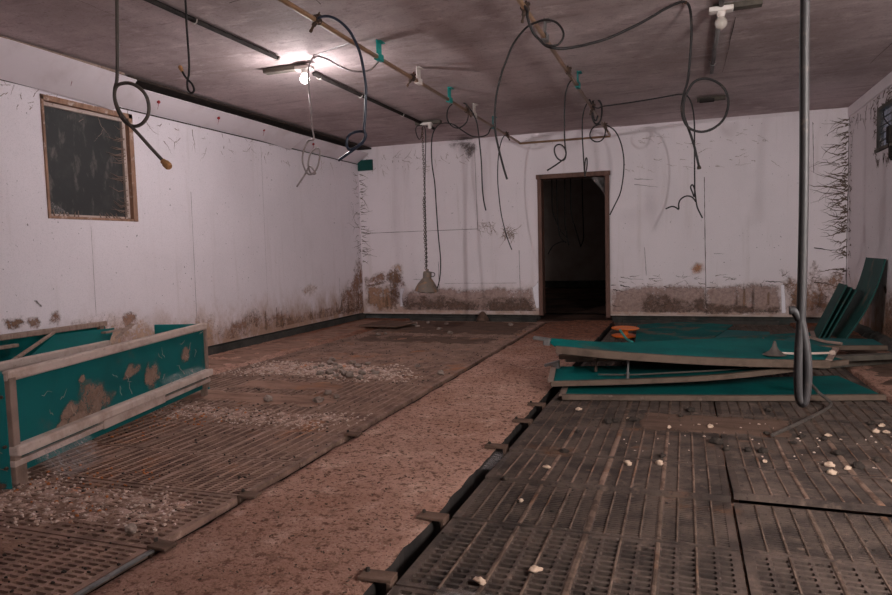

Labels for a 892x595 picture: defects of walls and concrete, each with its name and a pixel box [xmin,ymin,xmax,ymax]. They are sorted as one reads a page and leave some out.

leakage [199,261,364,340]
leakage [782,268,843,311]